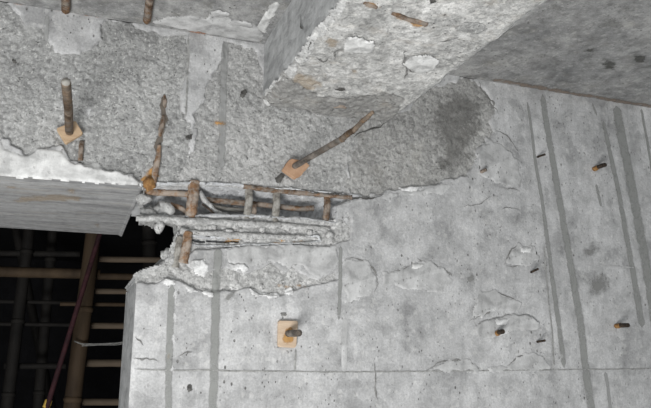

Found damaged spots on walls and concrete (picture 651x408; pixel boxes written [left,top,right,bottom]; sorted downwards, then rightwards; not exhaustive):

spalling [0,0,522,303]
damp [437,96,479,167]
crack [479,82,499,114]